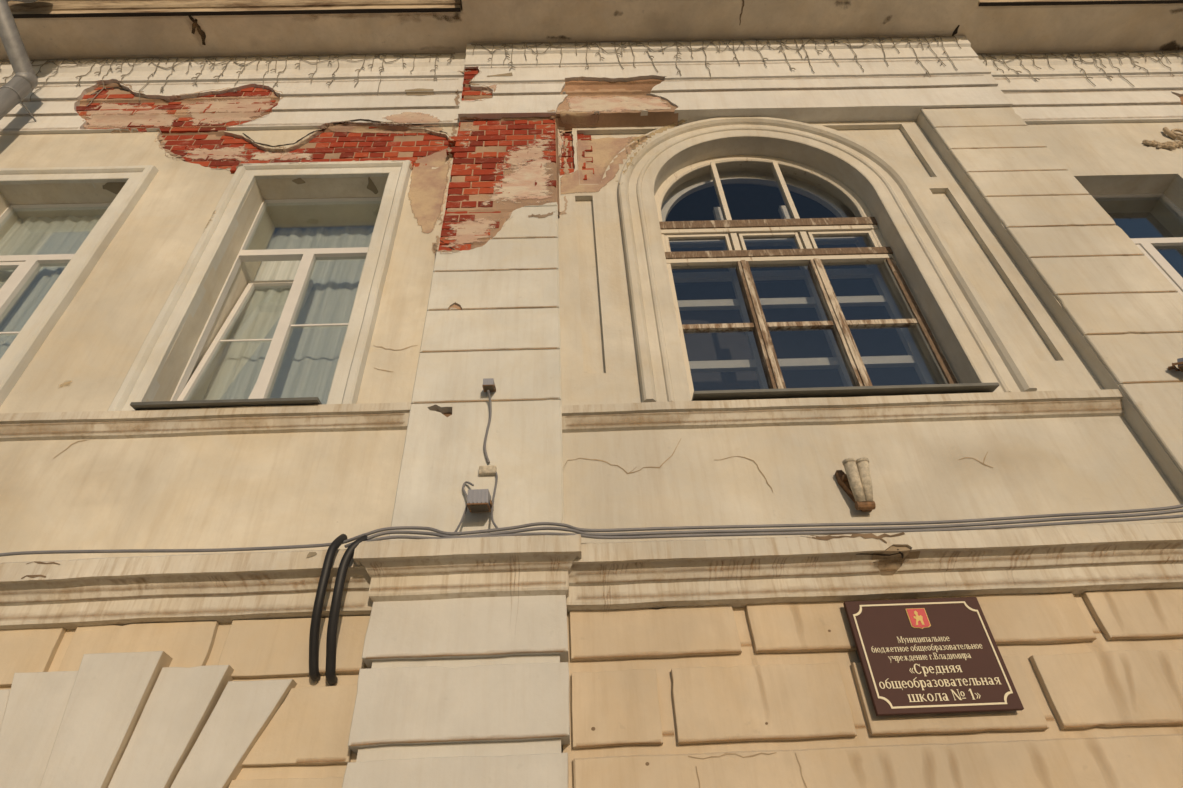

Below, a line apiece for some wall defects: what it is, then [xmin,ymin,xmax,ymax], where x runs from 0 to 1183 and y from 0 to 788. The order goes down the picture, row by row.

crack [189,16,206,45]
leakage [1160,41,1183,51]
flaking render [76,69,685,254]
crack [563,439,681,474]
crack [721,456,773,492]
flaking render [872,546,920,576]
crack [688,752,807,788]